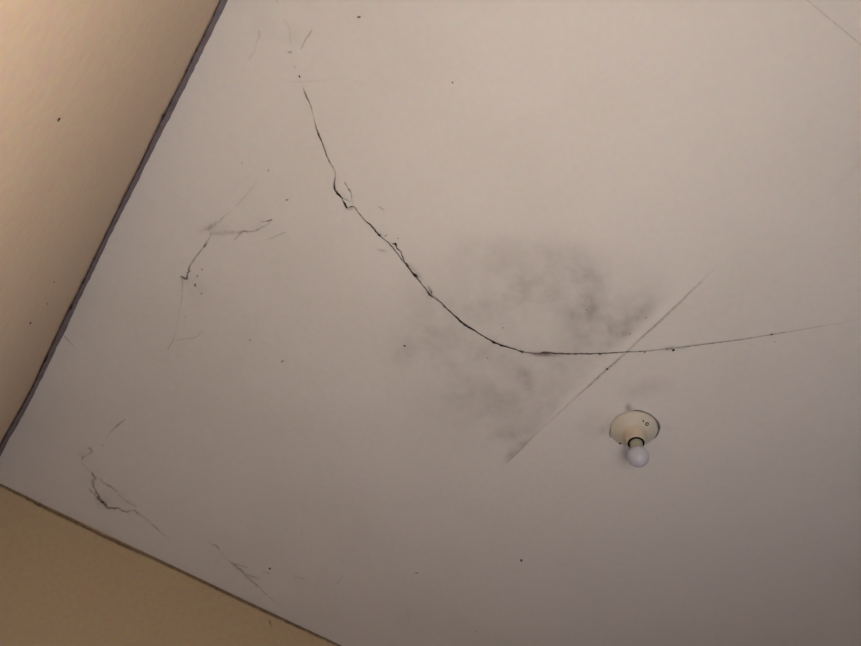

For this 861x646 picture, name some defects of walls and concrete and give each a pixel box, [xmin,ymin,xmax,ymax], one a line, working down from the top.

crack [0,0,221,446]
crack [316,128,740,446]